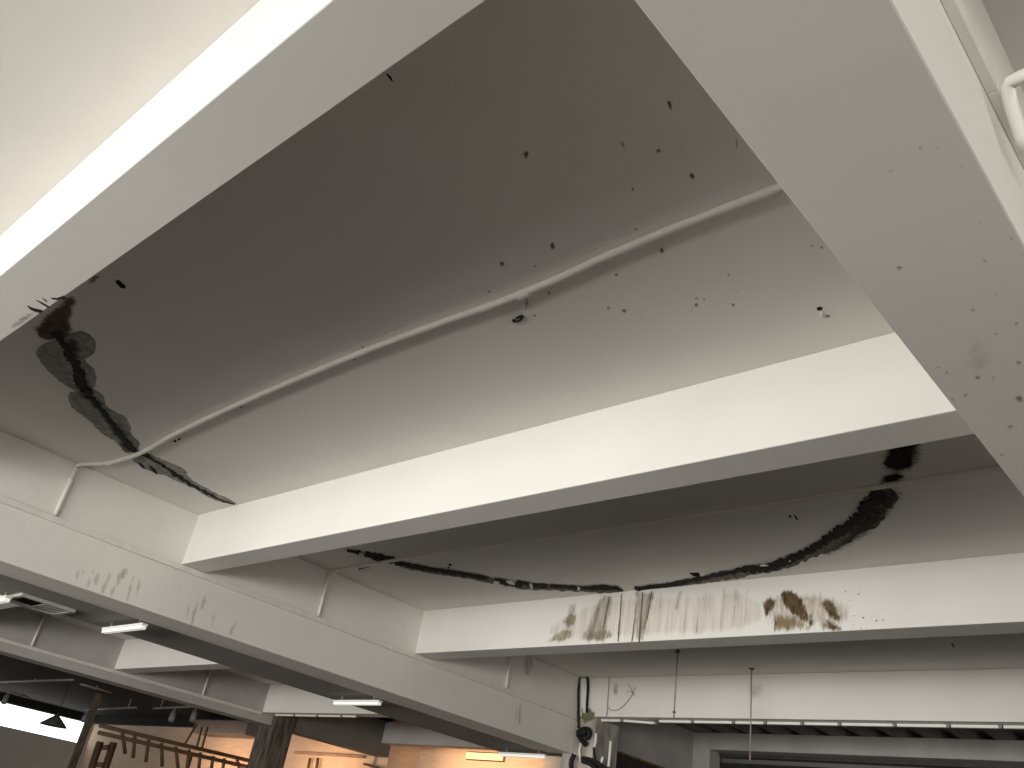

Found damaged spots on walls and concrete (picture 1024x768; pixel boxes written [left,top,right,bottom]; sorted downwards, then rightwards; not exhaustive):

crack [35,299,236,505]
crack [347,444,919,594]
corrosion [763,591,840,630]